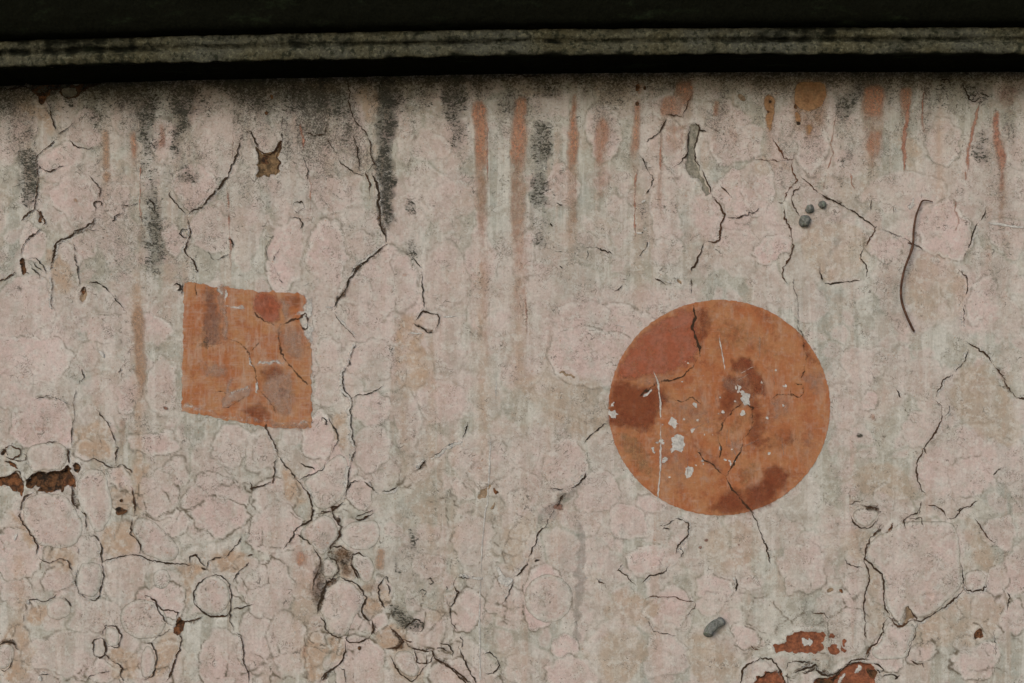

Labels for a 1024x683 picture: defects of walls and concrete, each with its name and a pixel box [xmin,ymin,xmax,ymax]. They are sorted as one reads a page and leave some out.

rust [764,95,775,130]
rust [794,82,826,134]
spalling [255,140,282,178]
leakage [0,72,1022,280]
rust [993,113,1006,169]
crack [641,95,922,403]
crack [0,86,500,683]
spalling [0,449,81,496]
crack [740,210,1024,683]
crack [505,423,605,599]
spalling [754,670,786,683]
spalling [773,631,877,683]